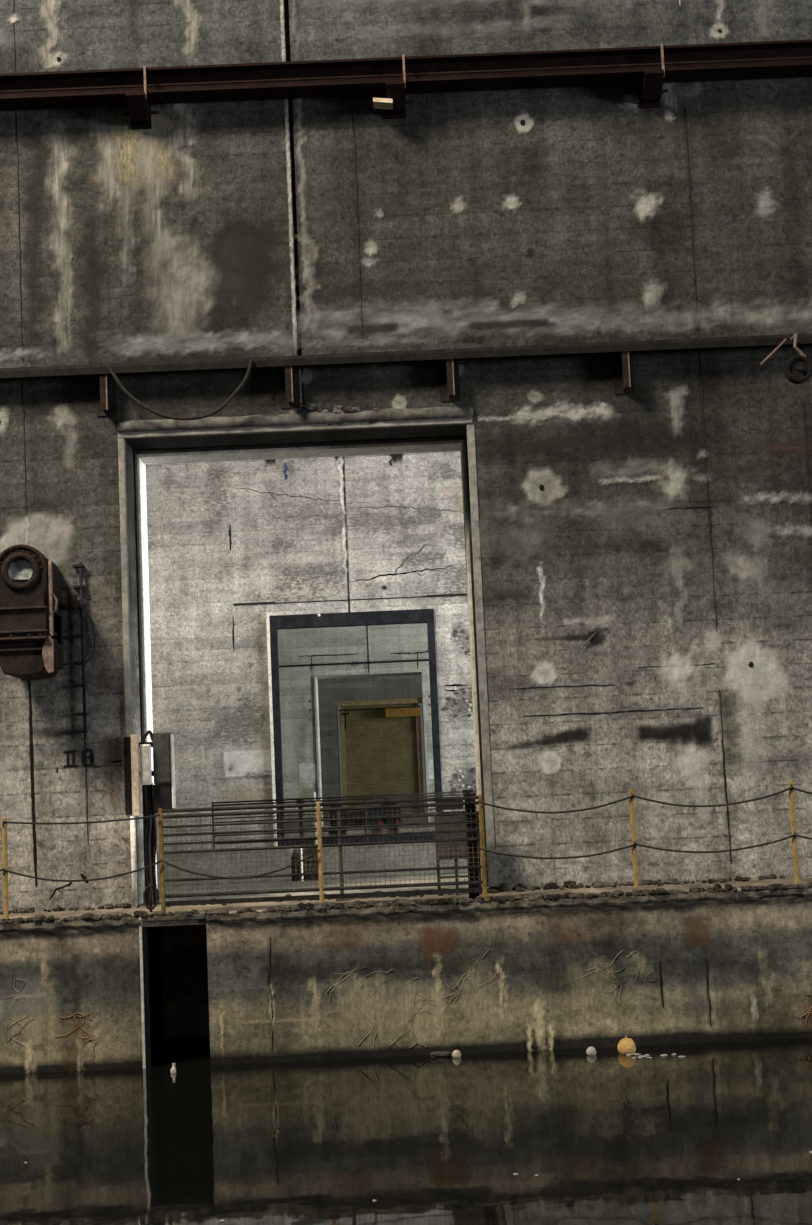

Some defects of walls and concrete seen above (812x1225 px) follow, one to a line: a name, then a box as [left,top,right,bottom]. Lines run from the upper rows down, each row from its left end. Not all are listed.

damp [93,111,127,219]
damp [23,124,99,353]
damp [126,102,812,355]
peeling [452,625,470,658]
peeling [442,687,473,721]
peeling [451,768,477,794]
damp [527,1004,554,1051]